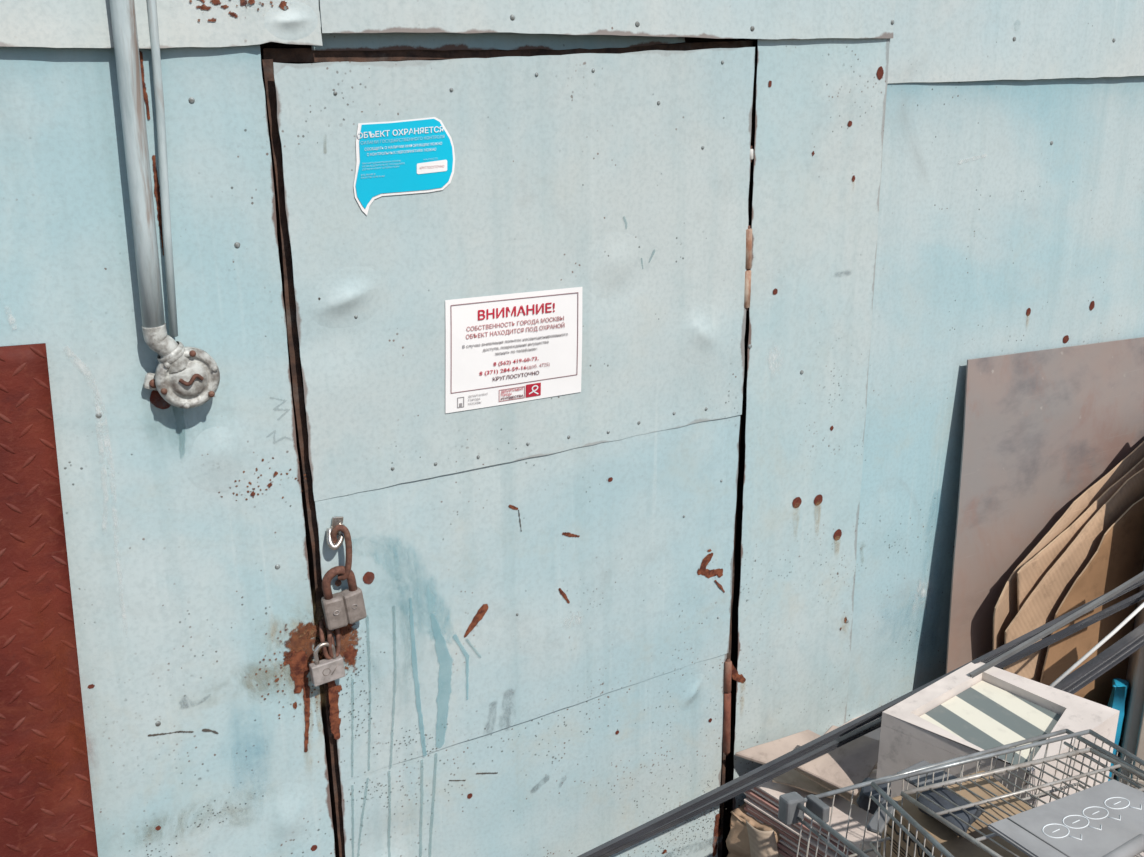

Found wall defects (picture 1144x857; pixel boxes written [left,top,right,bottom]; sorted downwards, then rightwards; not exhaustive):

corrosion [189,0,288,22]
corrosion [792,494,823,508]
corrosion [697,549,725,593]
corrosion [250,621,366,752]